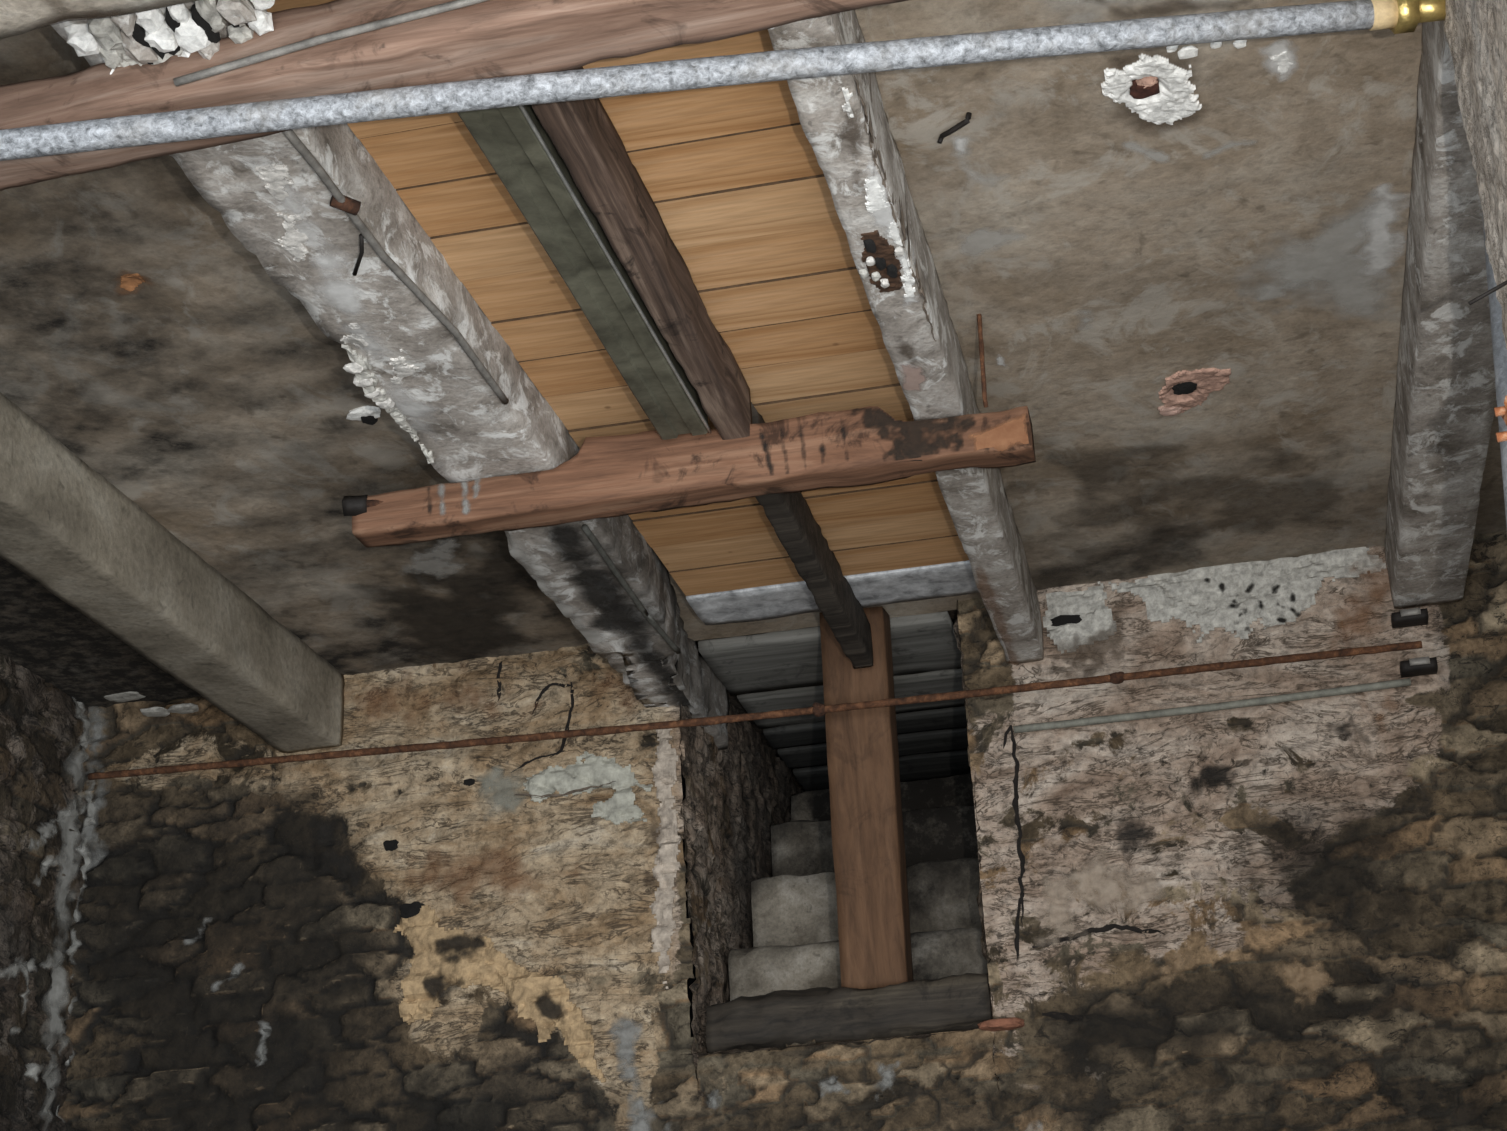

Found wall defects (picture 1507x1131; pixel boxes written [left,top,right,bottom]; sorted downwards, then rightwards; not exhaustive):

spalling [64,0,275,75]
spalling [1101,40,1247,127]
peeling [842,87,854,119]
spalling [859,165,916,302]
damp [1192,766,1231,789]
crack [1003,725,1165,962]
damp [1117,820,1149,853]
crack [1042,1011,1157,1029]
damp [1091,995,1254,1061]
damp [820,1078,842,1095]
damp [879,1067,893,1087]